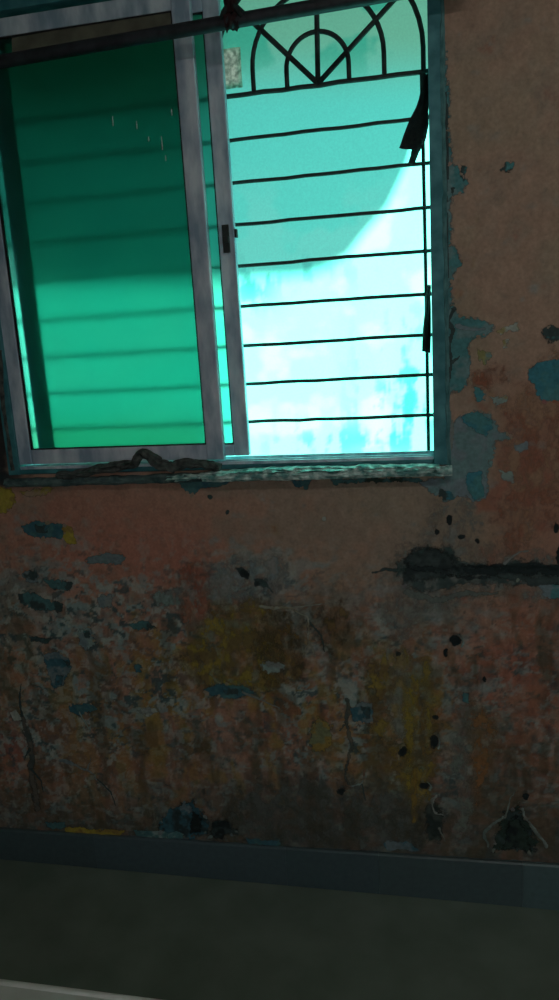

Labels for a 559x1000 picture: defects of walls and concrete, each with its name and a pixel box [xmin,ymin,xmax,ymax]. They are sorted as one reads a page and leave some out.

peeling [330,51,528,503]
peeling [541,324,559,343]
peeling [528,358,559,404]
peeling [21,520,77,545]
peeling [18,569,73,613]
leakage [153,555,350,691]
peeling [29,635,72,690]
peeling [203,682,280,709]
flaking render [158,798,239,840]
flaking render [482,791,548,855]